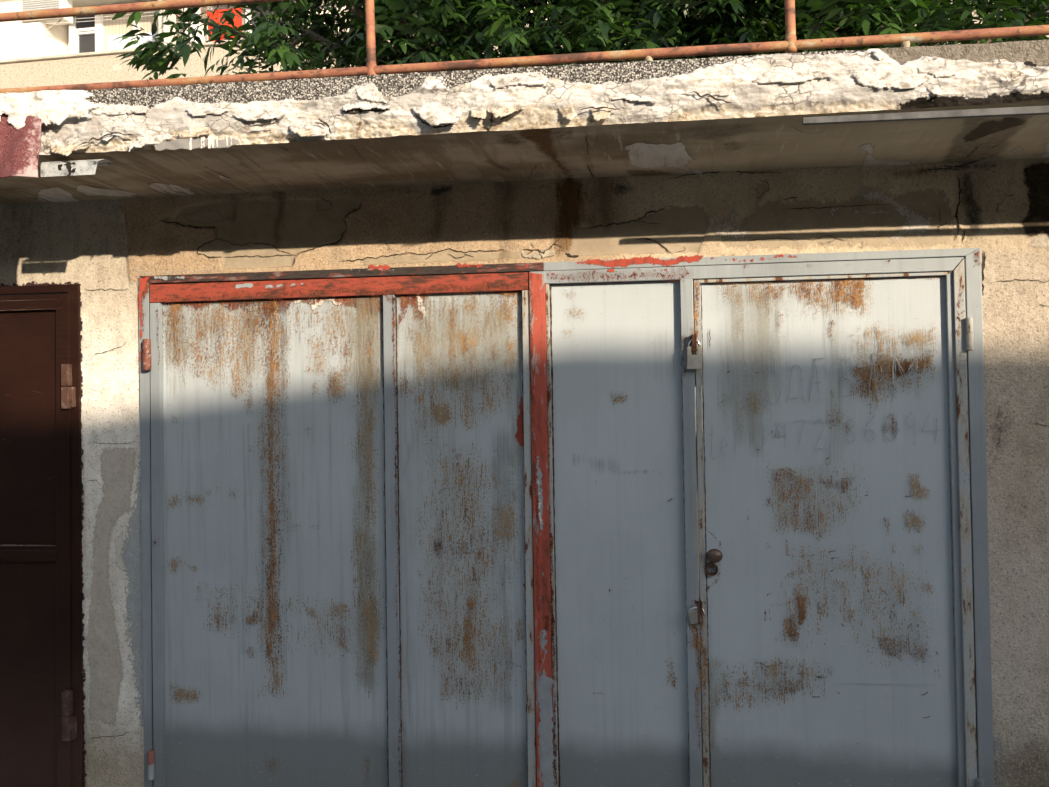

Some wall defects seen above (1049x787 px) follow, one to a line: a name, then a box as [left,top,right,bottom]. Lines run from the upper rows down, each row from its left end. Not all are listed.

peeling [39,39,1049,156]
spalling [158,198,361,269]
spalling [339,206,710,265]
damp [1020,163,1049,237]
corrosion [551,266,700,385]
corrosion [719,279,936,414]
corrosion [137,276,527,704]
corrosion [687,463,932,754]